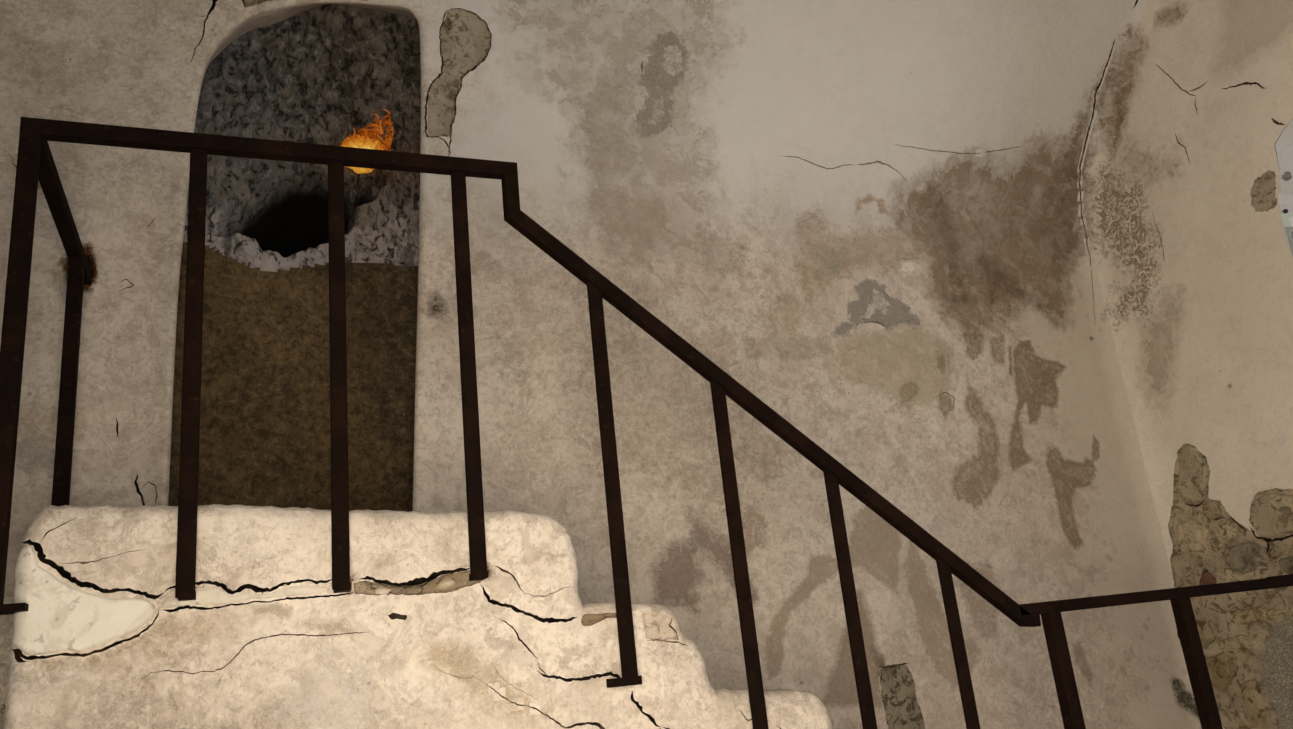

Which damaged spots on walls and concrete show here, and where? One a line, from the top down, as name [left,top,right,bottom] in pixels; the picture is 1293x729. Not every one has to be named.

crack [190,0,218,63]
flaking render [424,8,492,156]
crack [1157,65,1285,162]
leakage [854,28,1160,359]
flaking render [1250,170,1277,212]
corrosion [58,249,69,296]
corrosion [79,235,98,301]
flaking render [831,278,921,337]
leakage [953,341,1064,505]
leakage [1047,438,1099,549]
crack [12,517,670,729]
spalling [1168,443,1293,729]